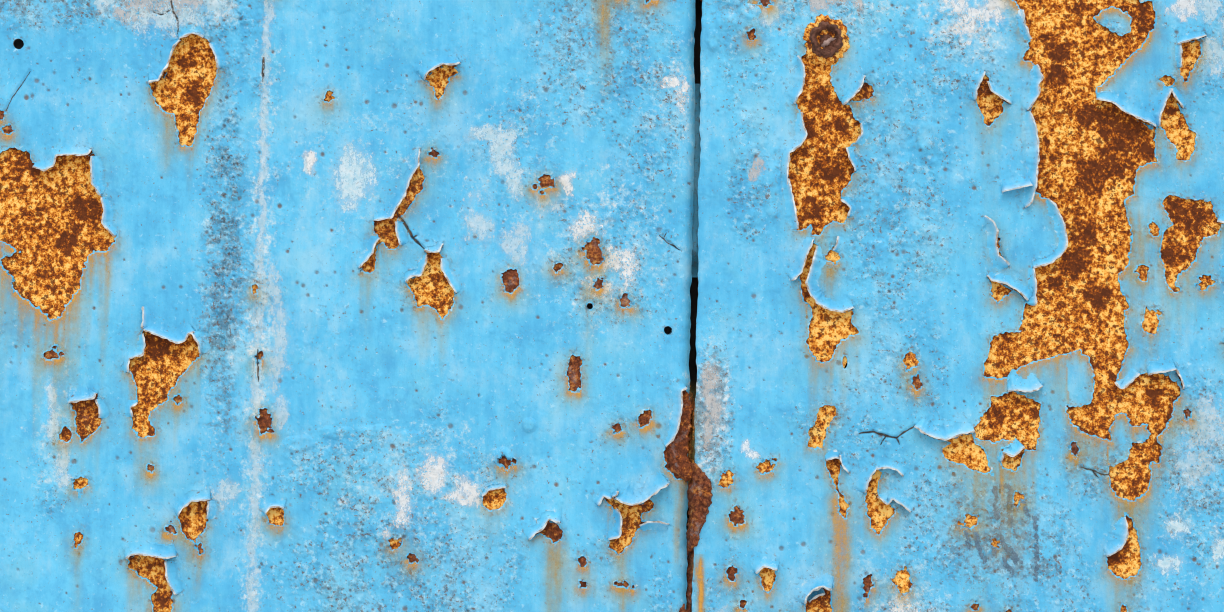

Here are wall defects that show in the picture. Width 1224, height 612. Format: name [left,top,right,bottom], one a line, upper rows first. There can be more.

peeling [147,23,228,151]
peeling [0,140,118,344]
peeling [354,149,425,273]
peeling [401,240,462,324]
peeling [777,55,875,368]
peeling [914,0,1207,584]
peeling [1160,195,1224,297]
peeling [58,306,212,445]
peeling [123,483,219,612]
peeling [591,382,695,559]
peeling [749,554,780,599]
peeling [790,405,916,612]